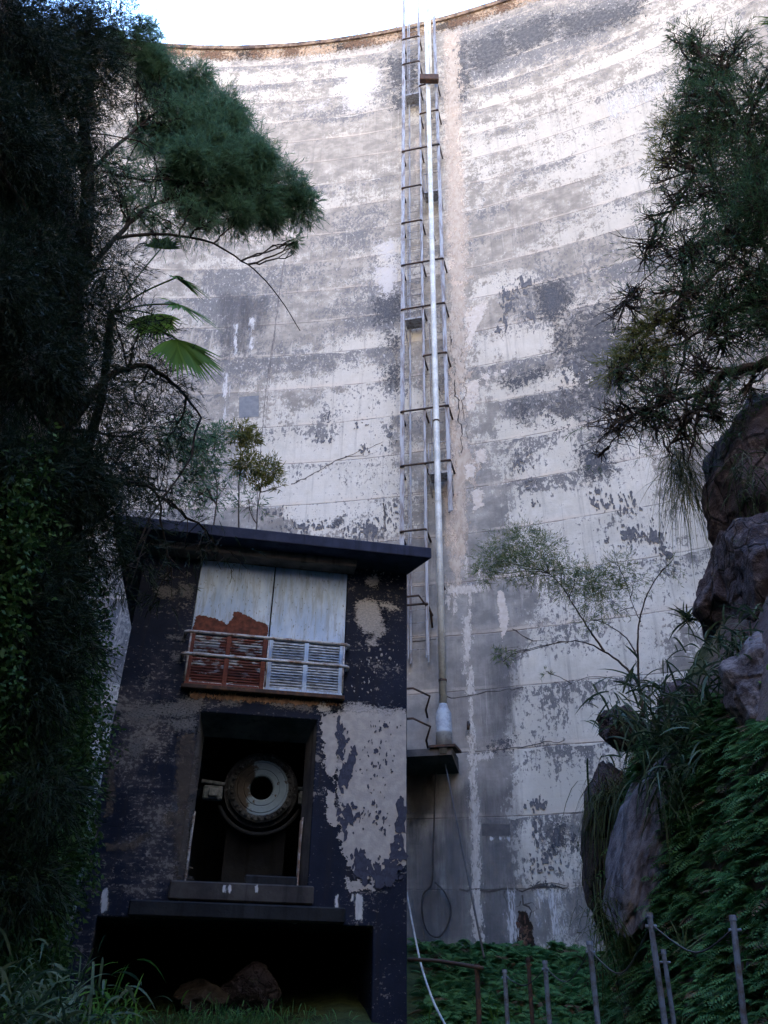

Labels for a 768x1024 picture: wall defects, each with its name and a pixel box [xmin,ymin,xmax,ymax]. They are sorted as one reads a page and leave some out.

water stain [222,373,231,422]
water stain [223,295,261,356]
crack [291,442,382,485]
water stain [439,0,650,944]
peeling [267,570,408,892]
water stain [407,774,435,943]